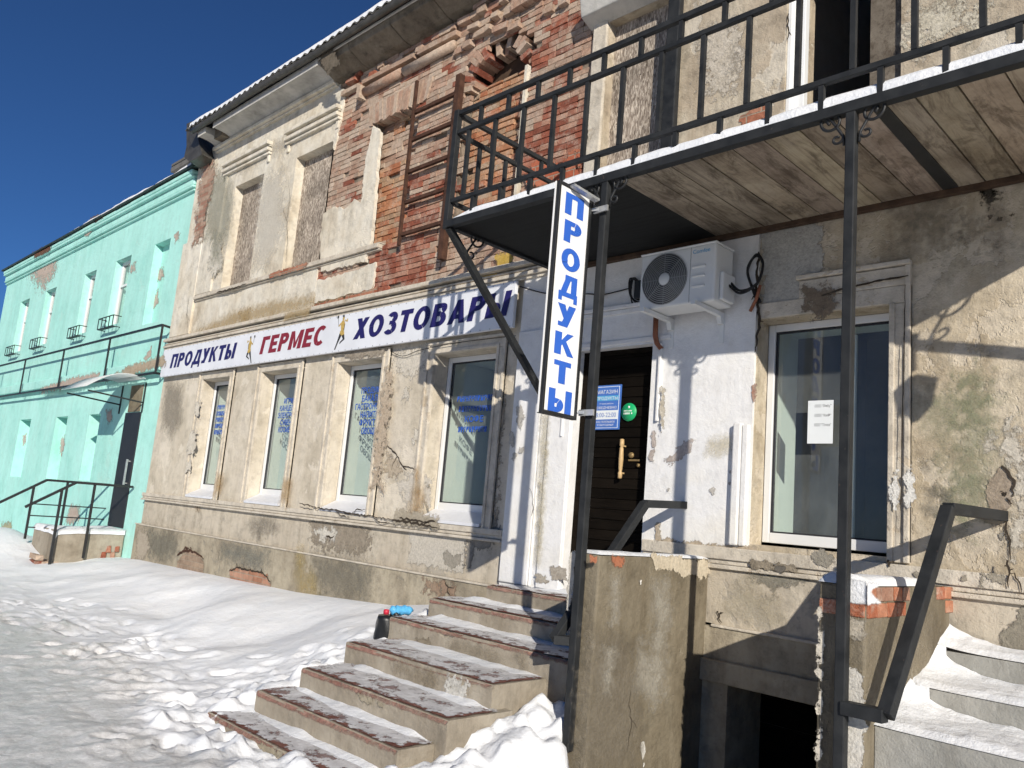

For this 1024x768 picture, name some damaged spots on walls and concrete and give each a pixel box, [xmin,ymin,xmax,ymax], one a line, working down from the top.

hole [484,53,527,86]
flaking render [525,148,581,188]
peeling [648,386,693,466]
crack [387,446,414,470]
flaking render [980,416,1024,564]
spalling [309,519,374,557]
flaking render [651,522,798,582]
crack [1001,465,1022,592]
flaking render [850,571,919,641]
flaking render [813,598,836,768]
flaking render [849,667,866,704]
flaking render [847,716,869,768]